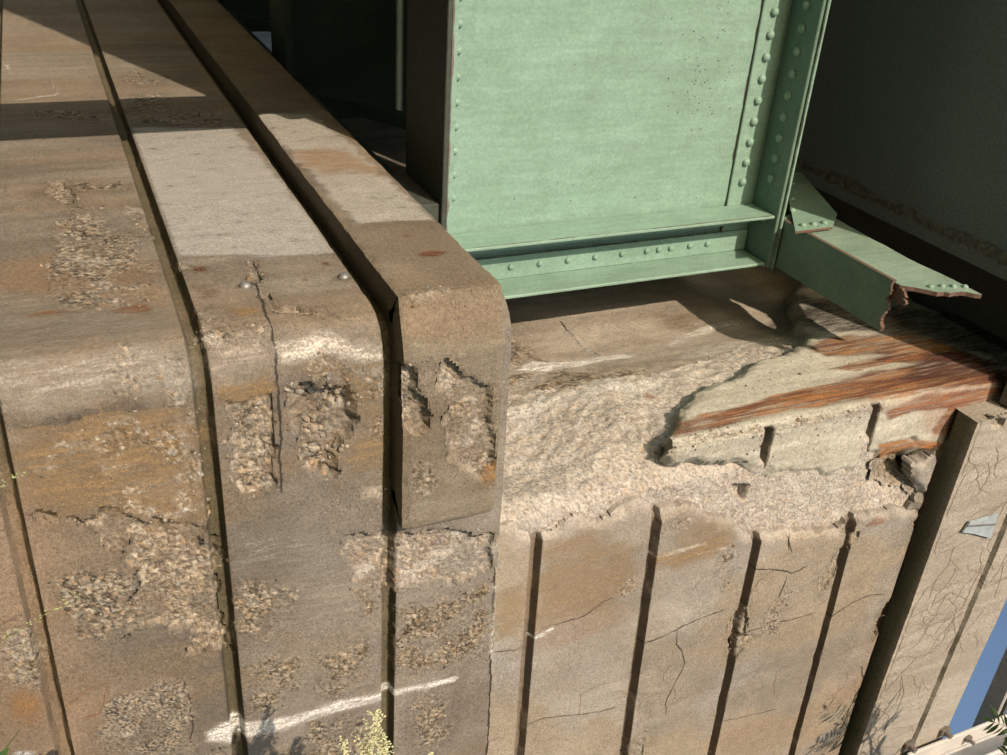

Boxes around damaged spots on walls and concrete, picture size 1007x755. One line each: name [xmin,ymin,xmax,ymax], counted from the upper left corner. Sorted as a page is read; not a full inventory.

peeling [39,180,156,315]
spalling [796,157,1007,267]
crack [254,282,283,494]
rust [675,335,1007,457]
spalling [985,412,1007,428]
spalling [28,256,924,755]
crack [527,409,1007,755]
spalling [0,617,56,690]